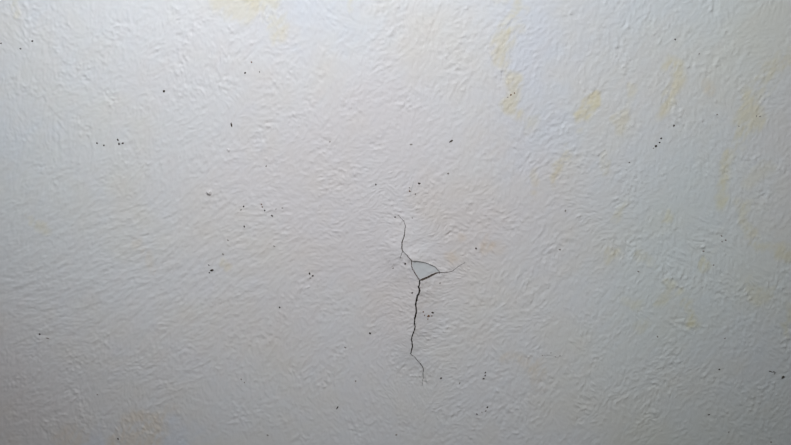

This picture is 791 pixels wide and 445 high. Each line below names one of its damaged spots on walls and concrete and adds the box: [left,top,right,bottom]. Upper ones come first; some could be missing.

crack [398,215,465,385]